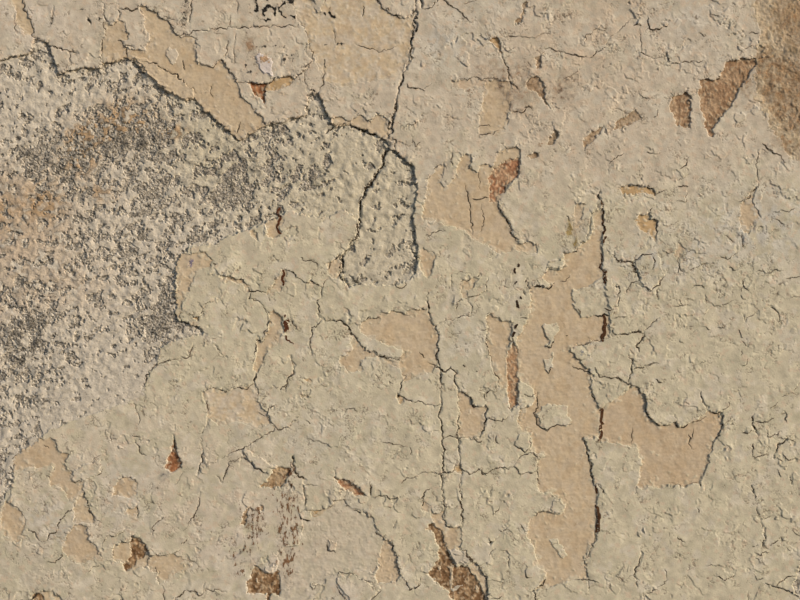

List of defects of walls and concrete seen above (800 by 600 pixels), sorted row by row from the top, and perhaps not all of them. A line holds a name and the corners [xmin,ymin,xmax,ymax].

crack [164,2,294,60]
spalling [526,56,548,105]
crack [502,15,702,86]
peeling [669,0,800,161]
crack [249,72,432,385]
spalling [0,0,538,600]
crack [572,236,800,387]
crack [179,360,330,482]
crack [370,392,569,522]
peeling [482,202,723,591]
crack [743,385,799,484]
crack [751,486,800,598]